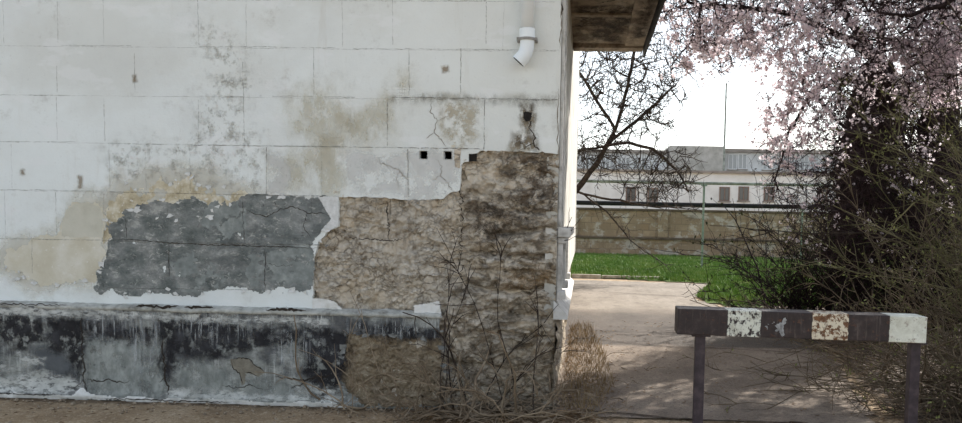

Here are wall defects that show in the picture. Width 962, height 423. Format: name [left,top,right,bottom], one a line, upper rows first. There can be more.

water stain [575,0,657,42]
crack [521,88,559,162]
peeling [0,150,331,299]
crack [350,158,408,242]
crack [427,107,464,292]
water stain [0,305,330,327]
water stain [0,356,82,396]
spalling [0,324,452,408]
water stain [168,386,350,405]